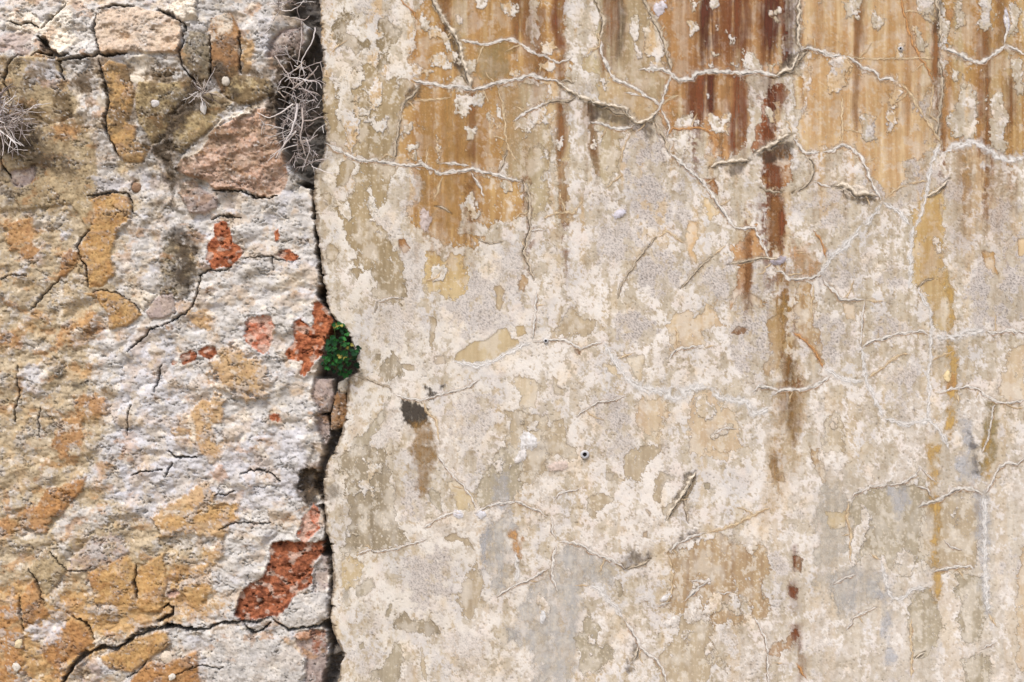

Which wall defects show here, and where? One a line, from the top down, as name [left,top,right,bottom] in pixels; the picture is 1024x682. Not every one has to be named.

crack [11,5,130,155]
rust [676,74,715,127]
rust [700,0,713,51]
rust [761,0,793,62]
peeling [315,0,1024,355]
rust [745,76,790,321]
spalling [285,302,336,377]
crack [326,0,1024,682]
peeling [234,397,409,623]
damp [400,385,444,492]
crack [62,603,330,682]
peeling [654,532,772,682]